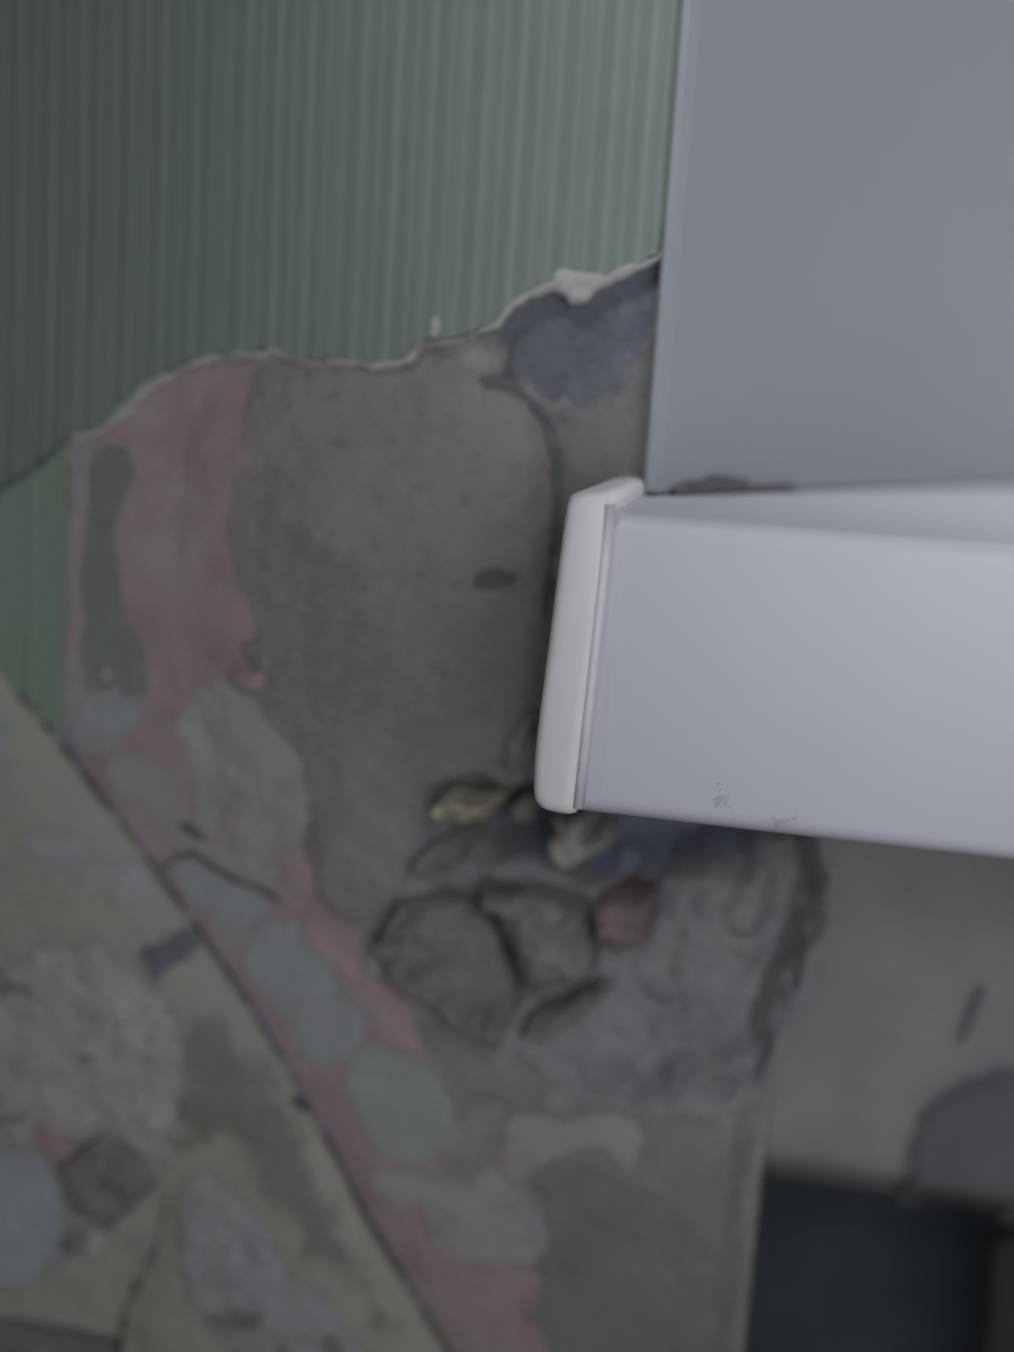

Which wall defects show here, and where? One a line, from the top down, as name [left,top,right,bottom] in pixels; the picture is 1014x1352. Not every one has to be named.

peeling [63,441,95,741]
spalling [365,763,837,1205]